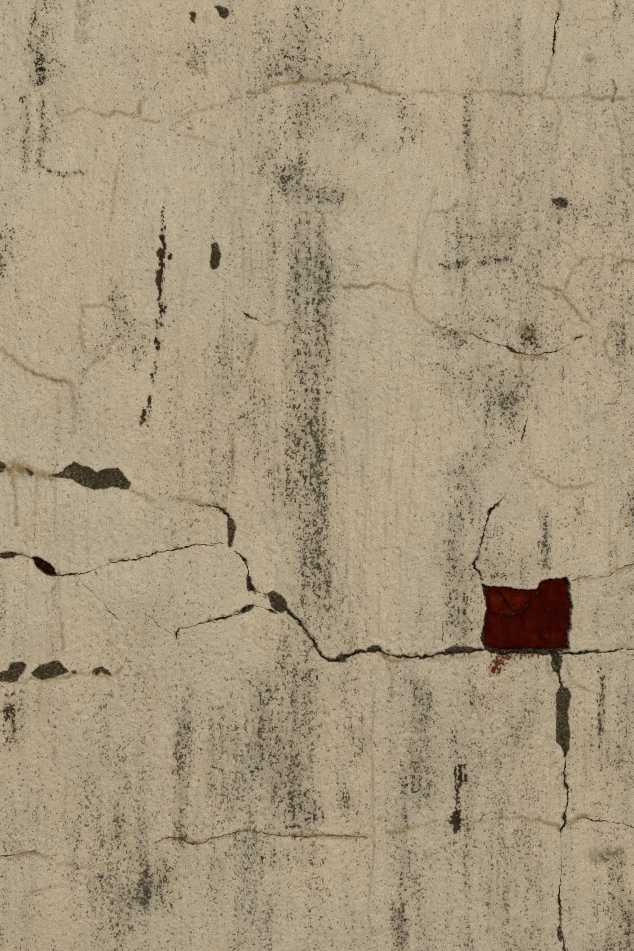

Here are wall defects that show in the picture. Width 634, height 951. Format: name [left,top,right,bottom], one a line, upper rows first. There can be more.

spalling [210,243,221,269]
spalling [52,463,130,489]
leakage [206,0,381,902]
crack [473,482,511,581]
spalling [0,661,76,682]
crack [0,504,485,662]
spalling [480,577,570,672]
crack [155,829,367,854]
crack [555,648,634,951]